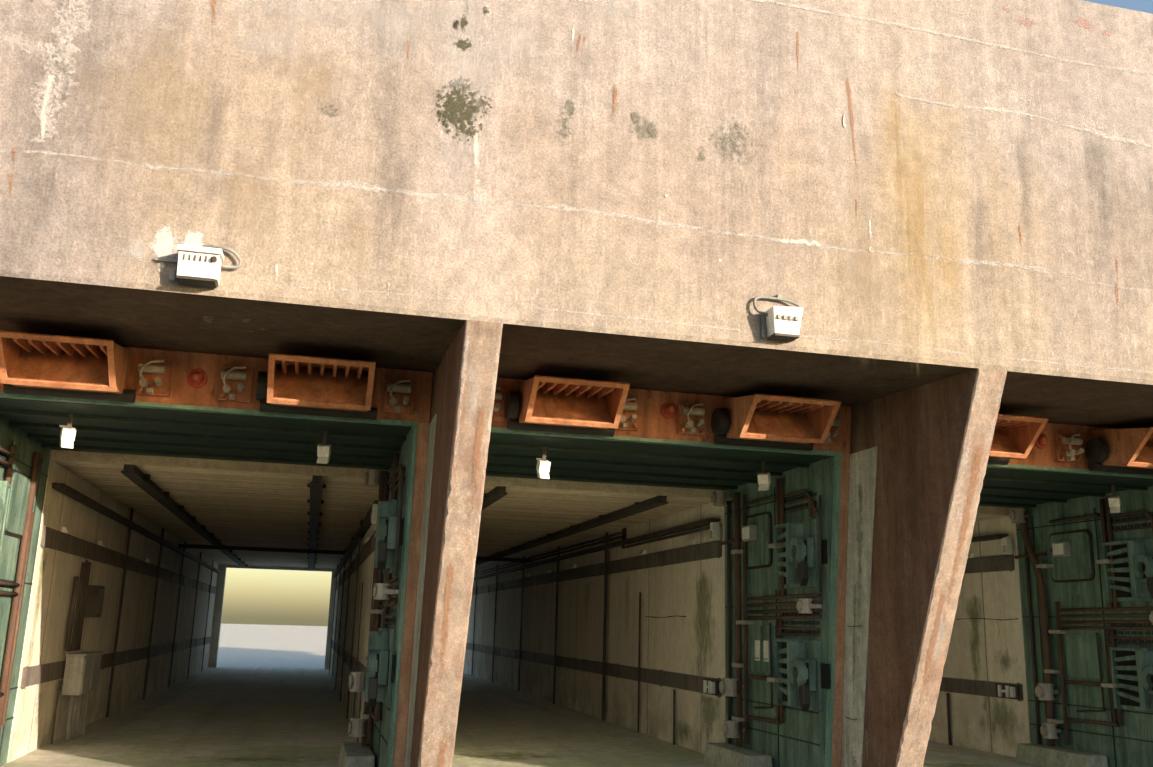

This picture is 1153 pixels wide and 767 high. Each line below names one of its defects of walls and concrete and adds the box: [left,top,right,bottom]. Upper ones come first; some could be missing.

crack [752,0,1153,74]
corrosion [846,81,855,155]
crack [0,75,1151,292]
water stain [130,227,205,271]